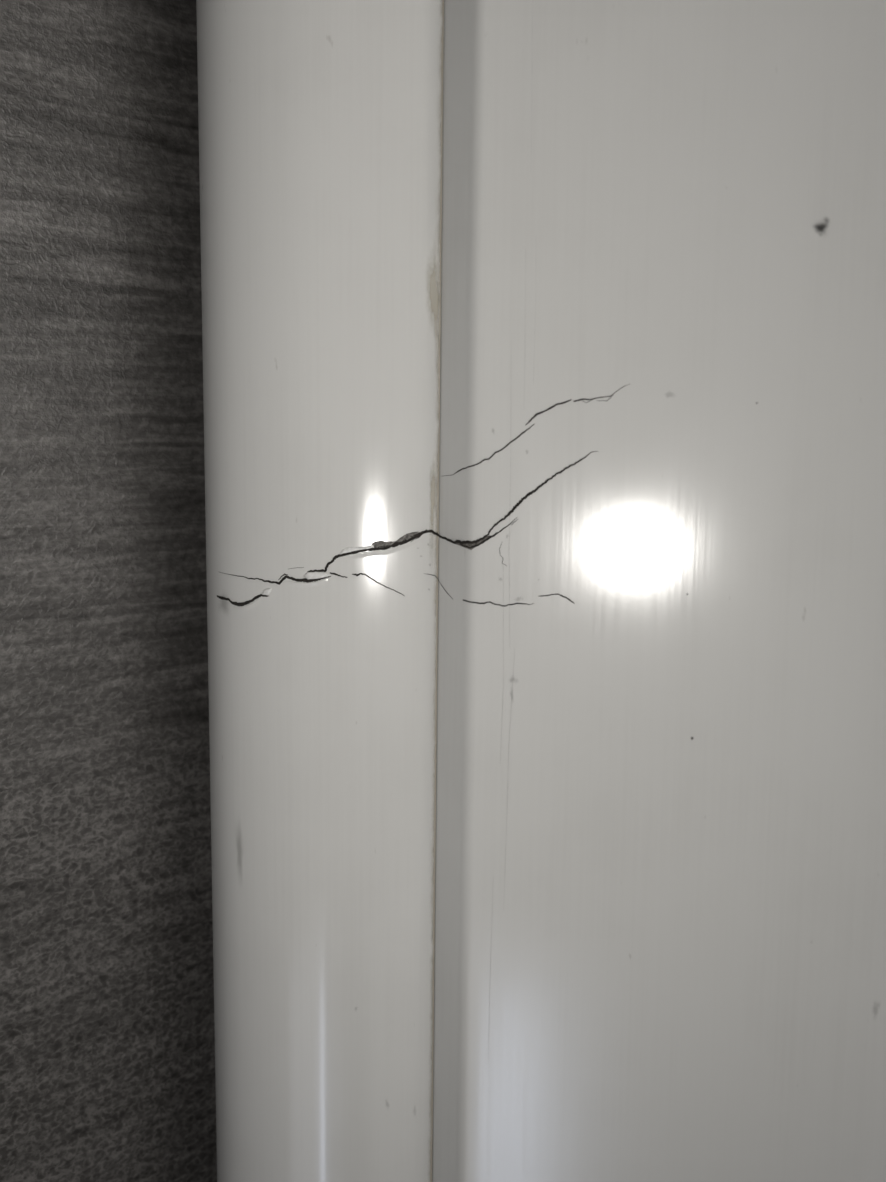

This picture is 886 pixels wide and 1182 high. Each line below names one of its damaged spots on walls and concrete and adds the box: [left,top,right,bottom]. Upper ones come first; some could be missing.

crack [446,384,629,476]
crack [217,451,598,612]